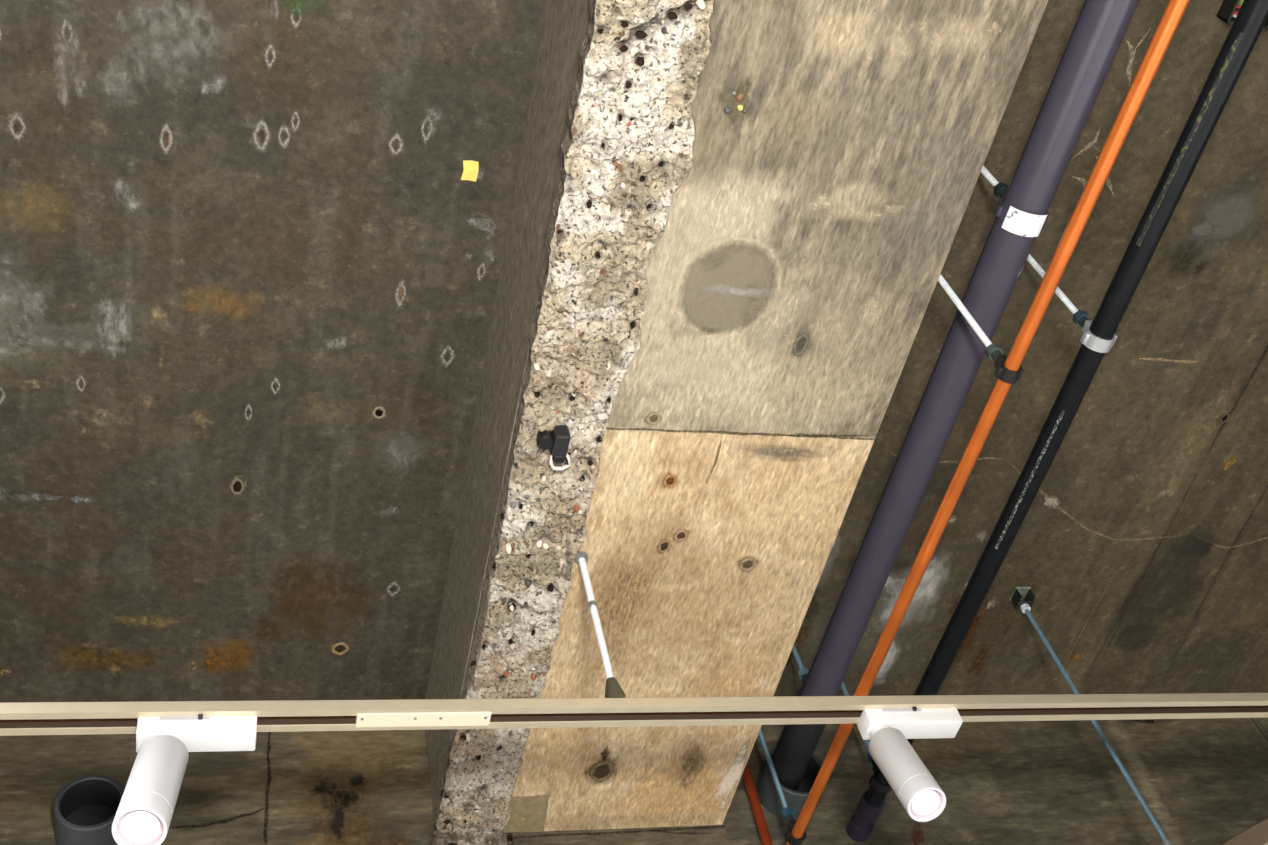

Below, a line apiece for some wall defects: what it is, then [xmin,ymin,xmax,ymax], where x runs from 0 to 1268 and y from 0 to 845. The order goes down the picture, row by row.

damp [859,561,941,680]
crack [171,732,271,842]